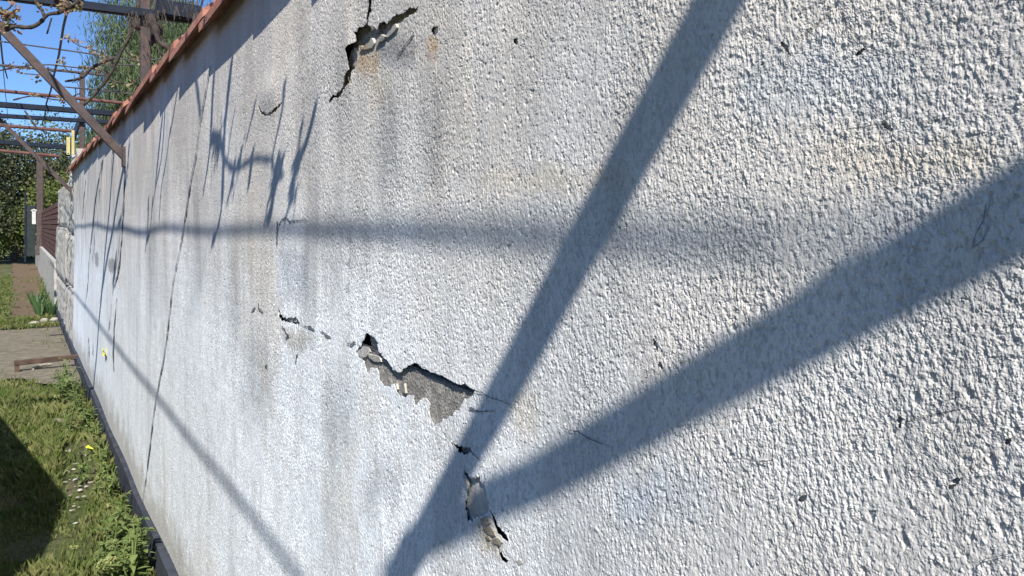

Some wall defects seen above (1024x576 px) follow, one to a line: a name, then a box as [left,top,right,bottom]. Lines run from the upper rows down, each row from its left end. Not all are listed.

crack [337,5,419,98]
crack [142,66,210,501]
crack [251,303,331,362]
flaking render [347,335,516,424]